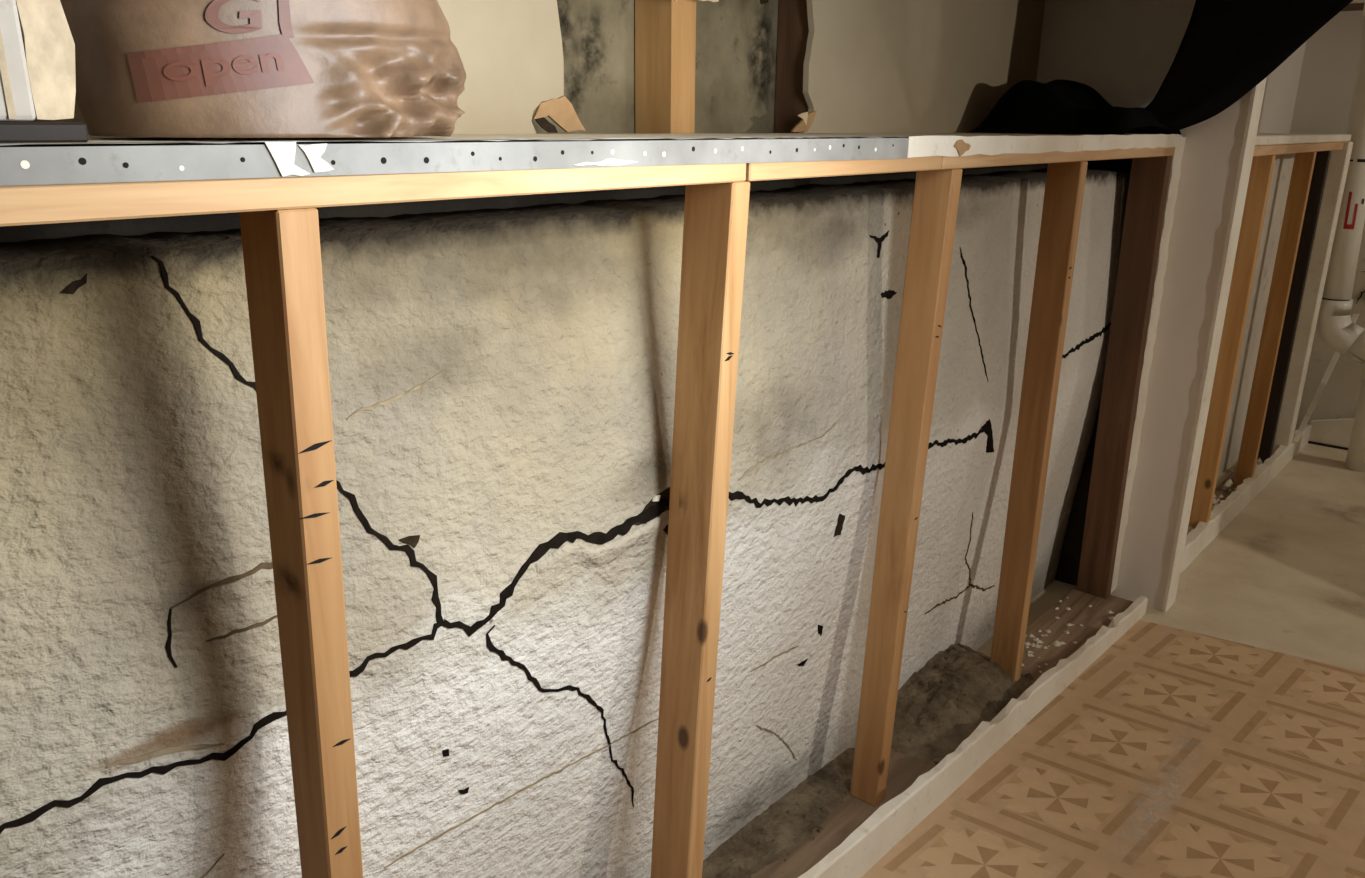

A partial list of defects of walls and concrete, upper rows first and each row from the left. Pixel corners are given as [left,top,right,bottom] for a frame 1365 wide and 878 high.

crack [152,256,256,390]
crack [959,247,988,381]
crack [1062,322,1111,358]
crack [728,419,885,508]
crack [928,425,990,449]
crack [165,562,277,668]
crack [336,480,670,868]
crack [751,645,800,672]
crack [924,512,995,615]
crack [0,711,287,834]
crack [756,725,797,760]
crack [200,854,225,878]